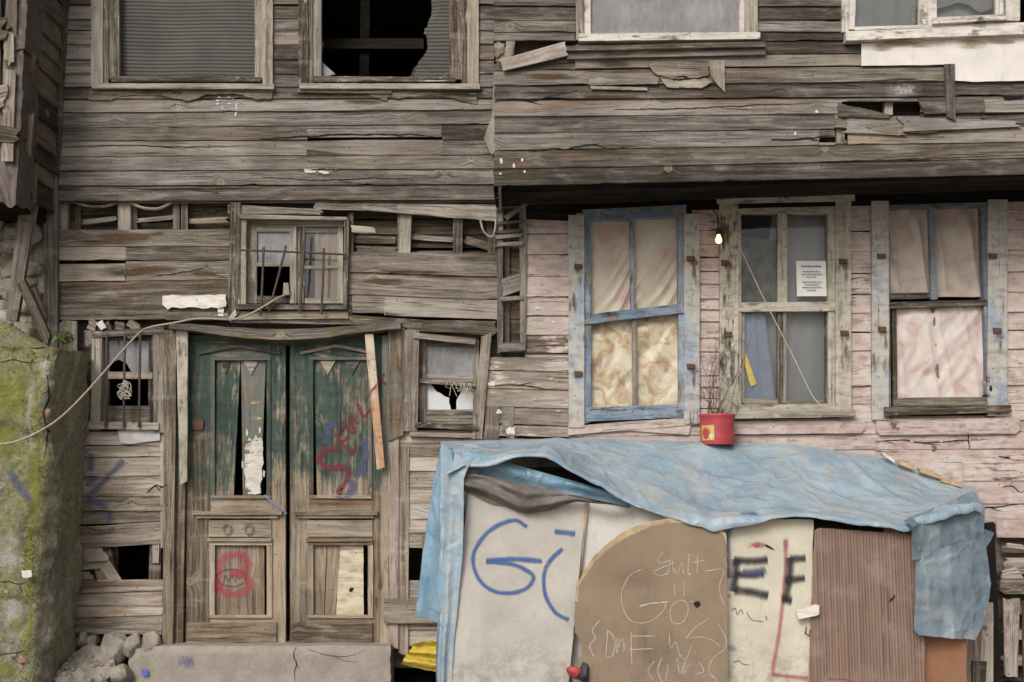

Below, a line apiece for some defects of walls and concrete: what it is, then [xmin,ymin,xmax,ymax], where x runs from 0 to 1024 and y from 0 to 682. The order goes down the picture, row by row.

crack [3,354,64,461]
peeling [242,401,265,495]
crack [883,438,1021,511]
crack [293,648,363,678]